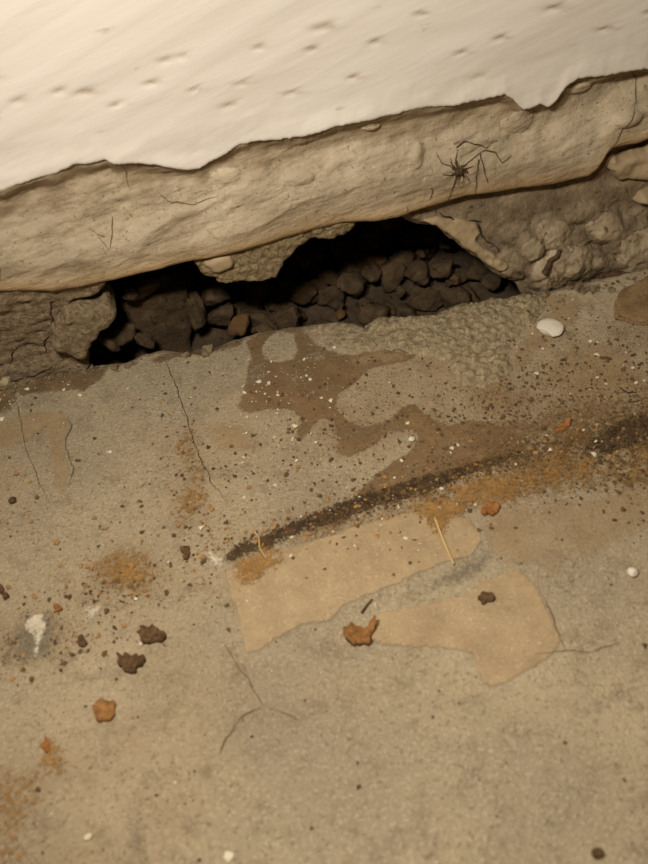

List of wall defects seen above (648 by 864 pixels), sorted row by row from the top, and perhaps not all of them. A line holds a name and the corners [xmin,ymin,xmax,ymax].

peeling [0,68,648,389]
crack [162,355,224,499]
water stain [212,329,648,503]